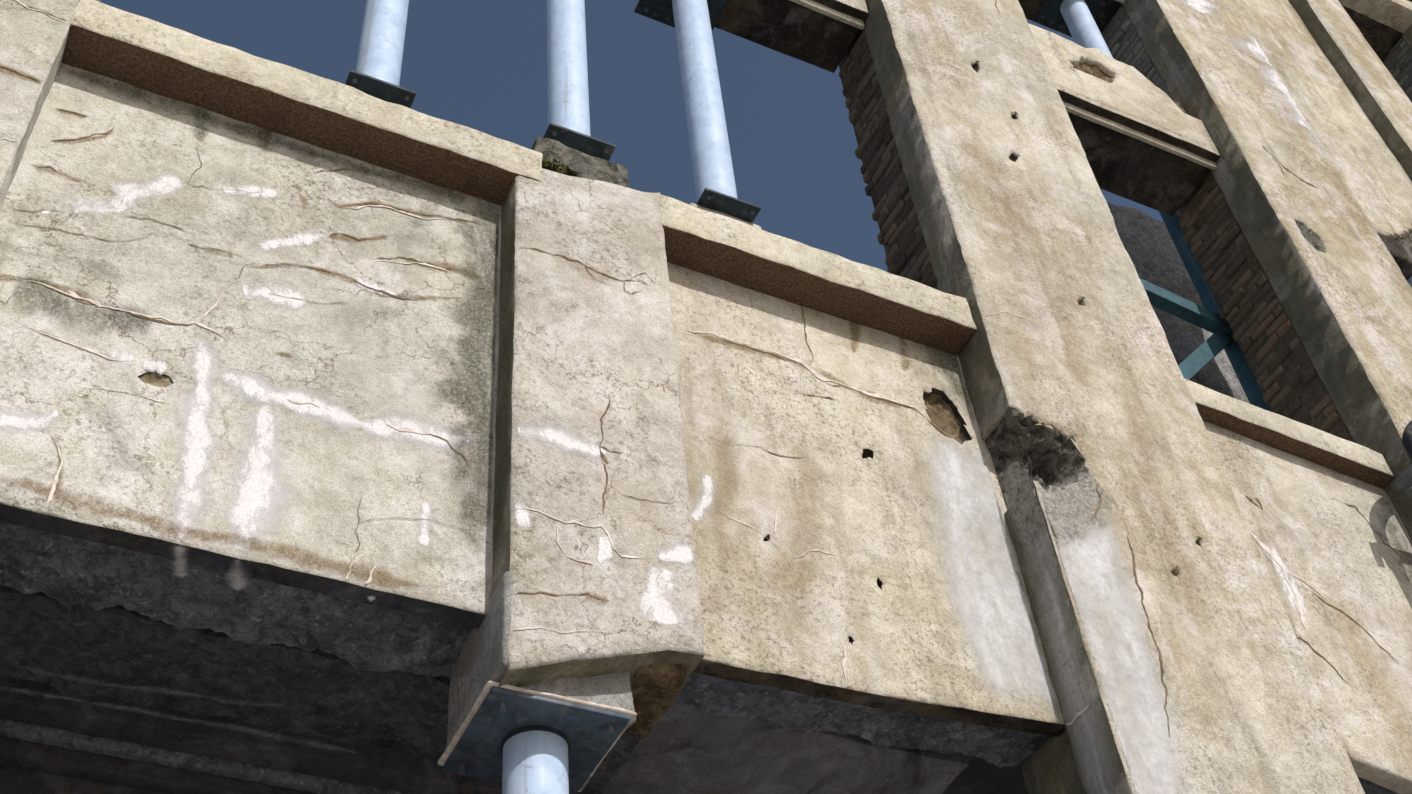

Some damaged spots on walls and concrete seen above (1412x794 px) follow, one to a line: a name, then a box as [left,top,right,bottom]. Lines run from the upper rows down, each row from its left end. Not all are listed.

efflorescence [72,173,183,217]
crack [0,168,498,403]
water stain [0,410,59,430]
spalling [138,360,173,387]
water stain [230,570,245,589]
water stain [174,203,606,576]
crack [514,399,678,633]
crack [686,305,931,421]
spalling [923,393,967,445]
spalling [985,409,1110,558]
crack [1127,528,1170,737]
crack [1245,495,1402,684]